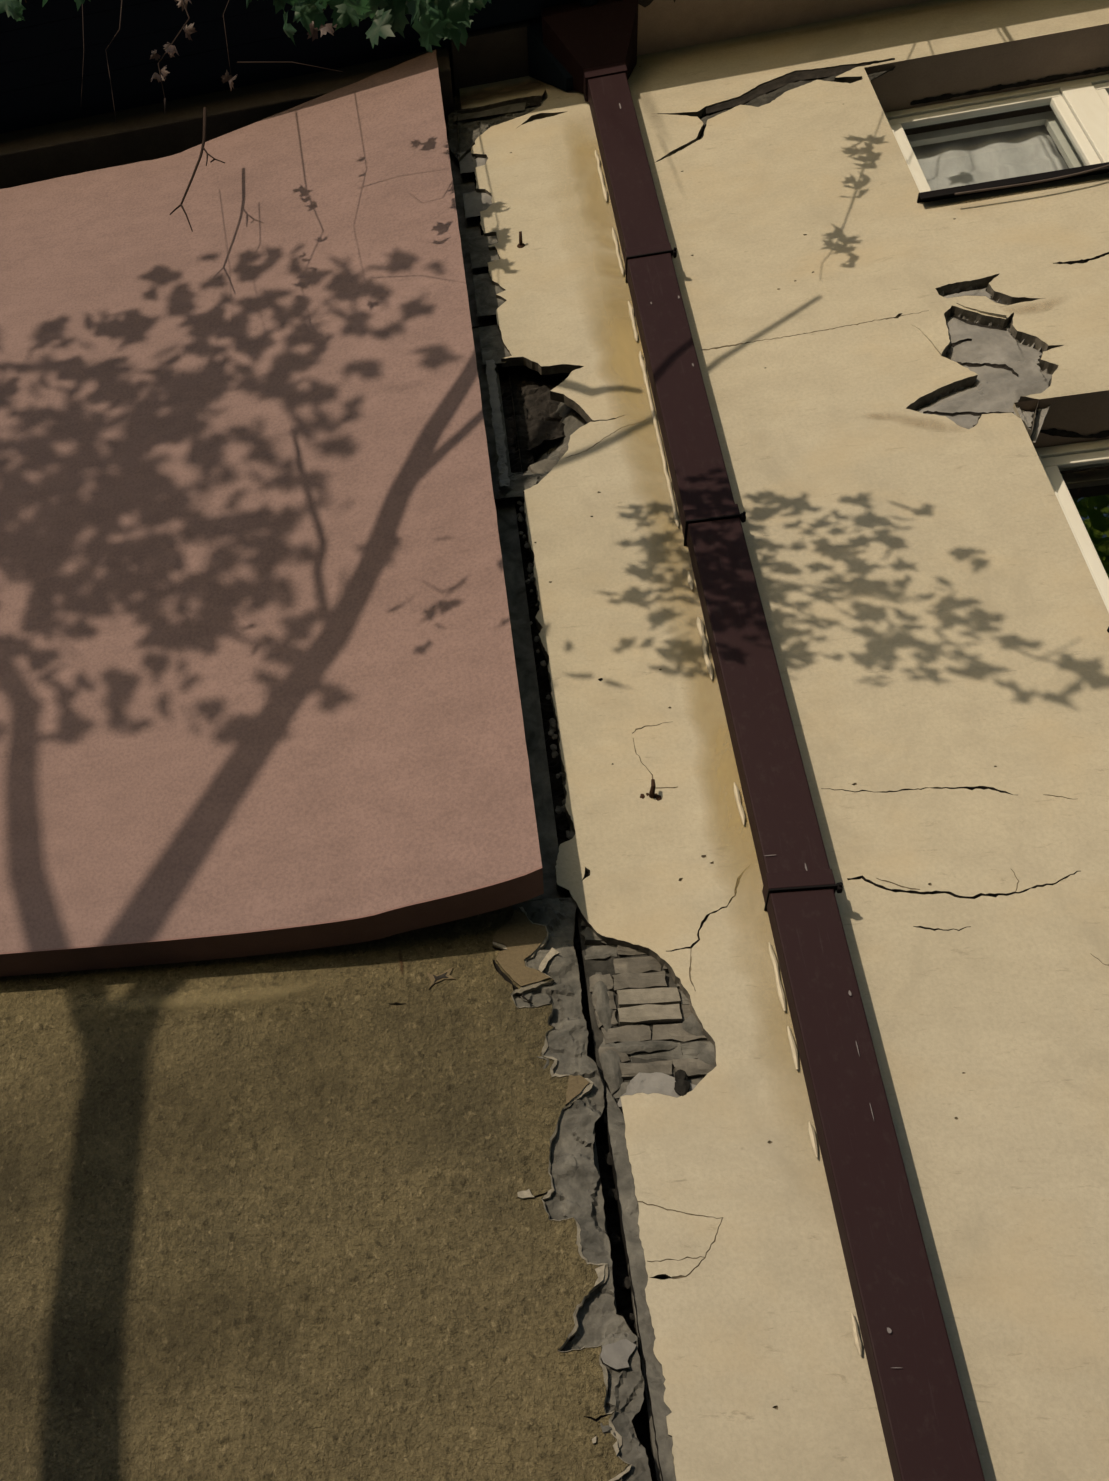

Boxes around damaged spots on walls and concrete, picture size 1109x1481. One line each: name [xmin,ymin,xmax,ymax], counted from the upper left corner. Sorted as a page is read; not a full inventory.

crack [656,58,895,162]
crack [910,67,1109,105]
crack [1053,252,1109,265]
spalling [448,89,595,500]
spalling [896,274,1063,443]
crack [632,722,677,789]
crack [829,786,1013,795]
crack [847,869,1080,931]
spalling [493,867,717,1481]